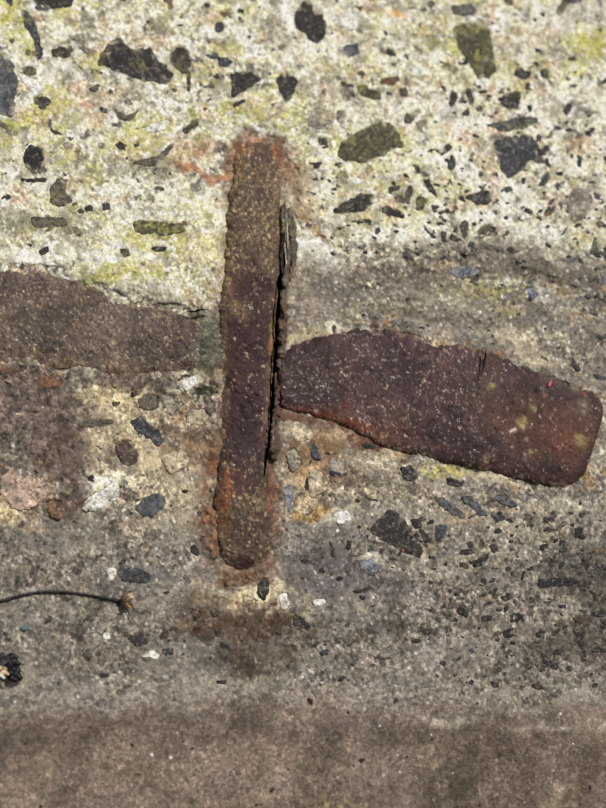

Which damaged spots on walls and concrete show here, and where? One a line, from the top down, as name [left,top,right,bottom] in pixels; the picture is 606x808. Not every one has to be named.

corrosion [175,135,294,203]
crack [264,231,285,477]
corrosion [265,290,384,502]
corrosion [200,447,221,558]